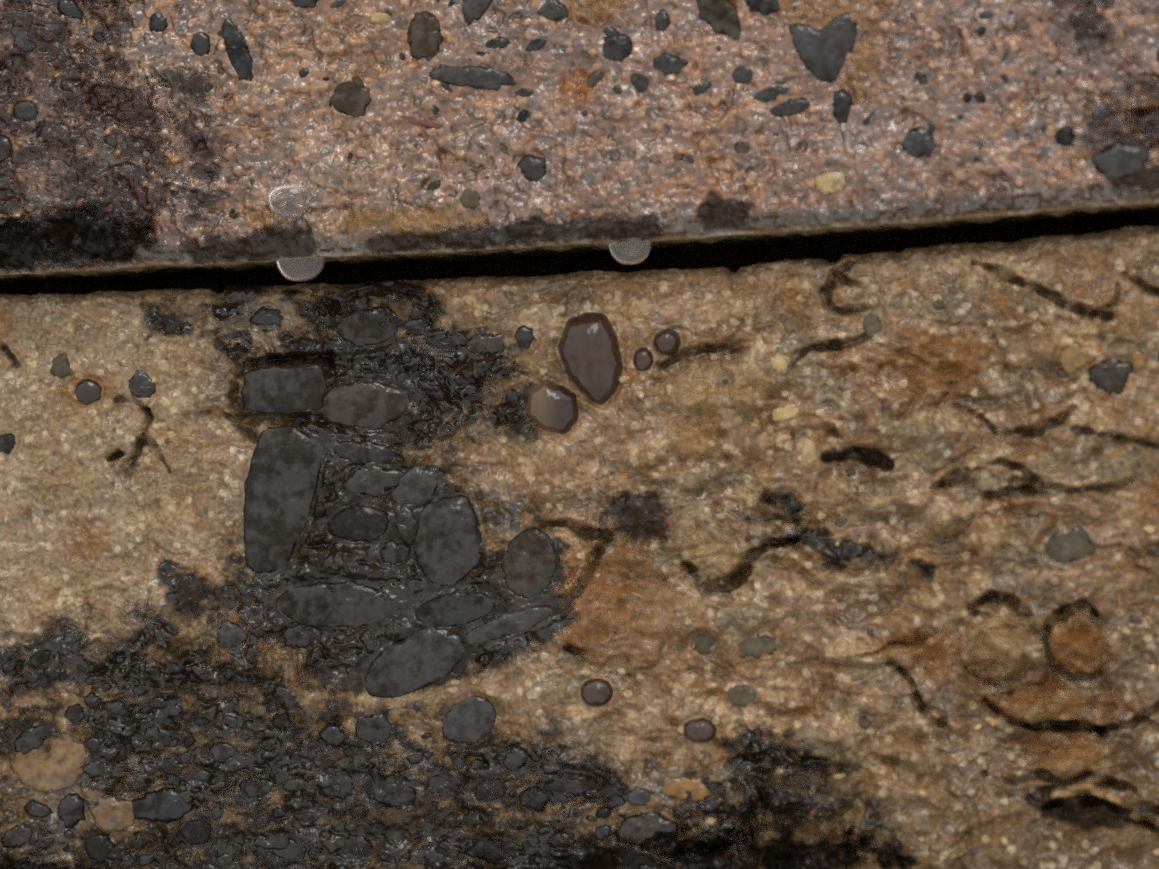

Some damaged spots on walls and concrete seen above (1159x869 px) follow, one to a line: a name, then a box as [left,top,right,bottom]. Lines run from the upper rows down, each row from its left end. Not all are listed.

water stain [0,0,232,273]
crack [792,261,868,365]
crack [972,263,1159,322]
crack [800,429,844,439]
crack [940,411,1159,498]
water stain [0,280,917,869]
water stain [910,559,936,578]
crack [971,591,1111,681]
crack [886,662,946,726]
crack [982,700,1156,734]
crack [982,770,1127,810]